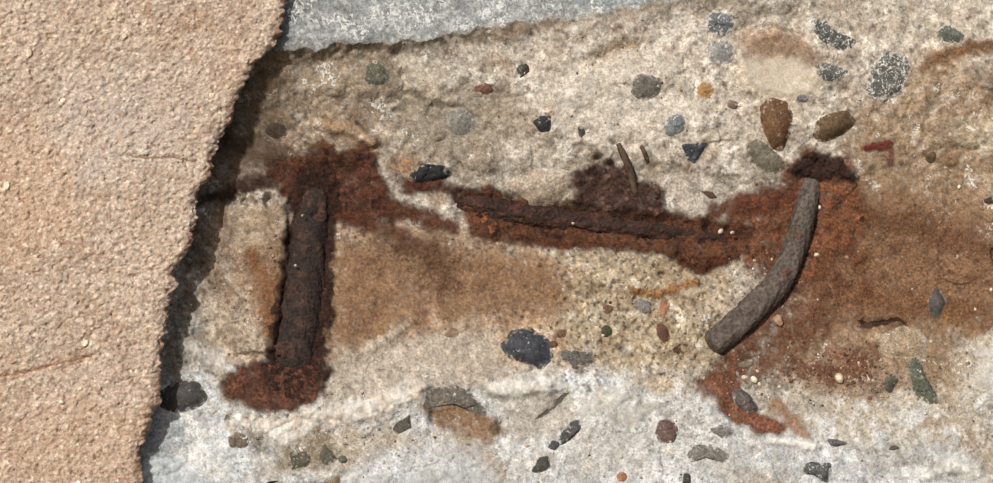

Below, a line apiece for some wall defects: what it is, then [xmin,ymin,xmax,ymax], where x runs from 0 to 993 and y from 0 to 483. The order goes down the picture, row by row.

rust [920,40,993,70]
spalling [713,213,736,225]
rust [200,137,993,437]
spalling [778,279,819,321]